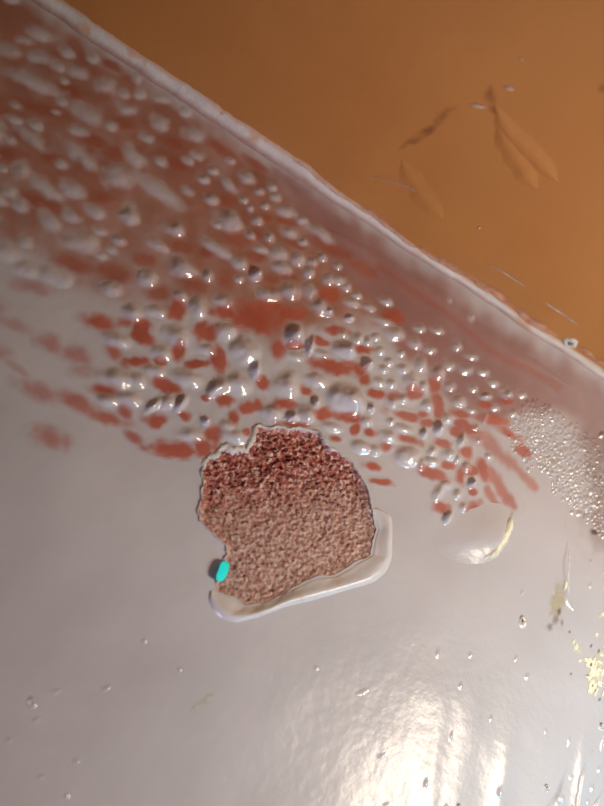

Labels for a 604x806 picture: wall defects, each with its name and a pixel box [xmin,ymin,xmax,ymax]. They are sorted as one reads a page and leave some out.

corrosion [0,0,550,524]
flaking render [196,423,393,622]